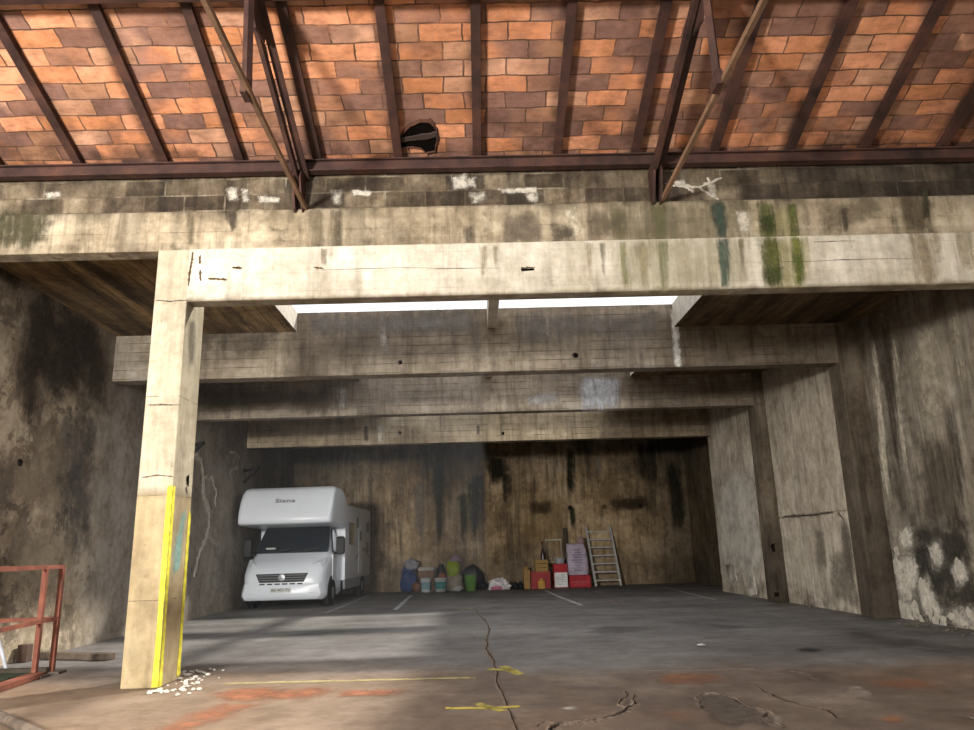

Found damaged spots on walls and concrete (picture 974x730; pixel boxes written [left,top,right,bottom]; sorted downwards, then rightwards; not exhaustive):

leakage [758,203,780,285]
leakage [788,204,803,284]
leakage [18,293,105,552]
leakage [460,475,484,535]
leakage [502,476,511,501]
leakage [525,496,558,539]
leakage [567,451,575,491]
leakage [612,497,646,509]
leakage [634,444,684,527]
peeling [893,526,974,629]
crack [448,608,642,730]
crack [694,684,875,728]